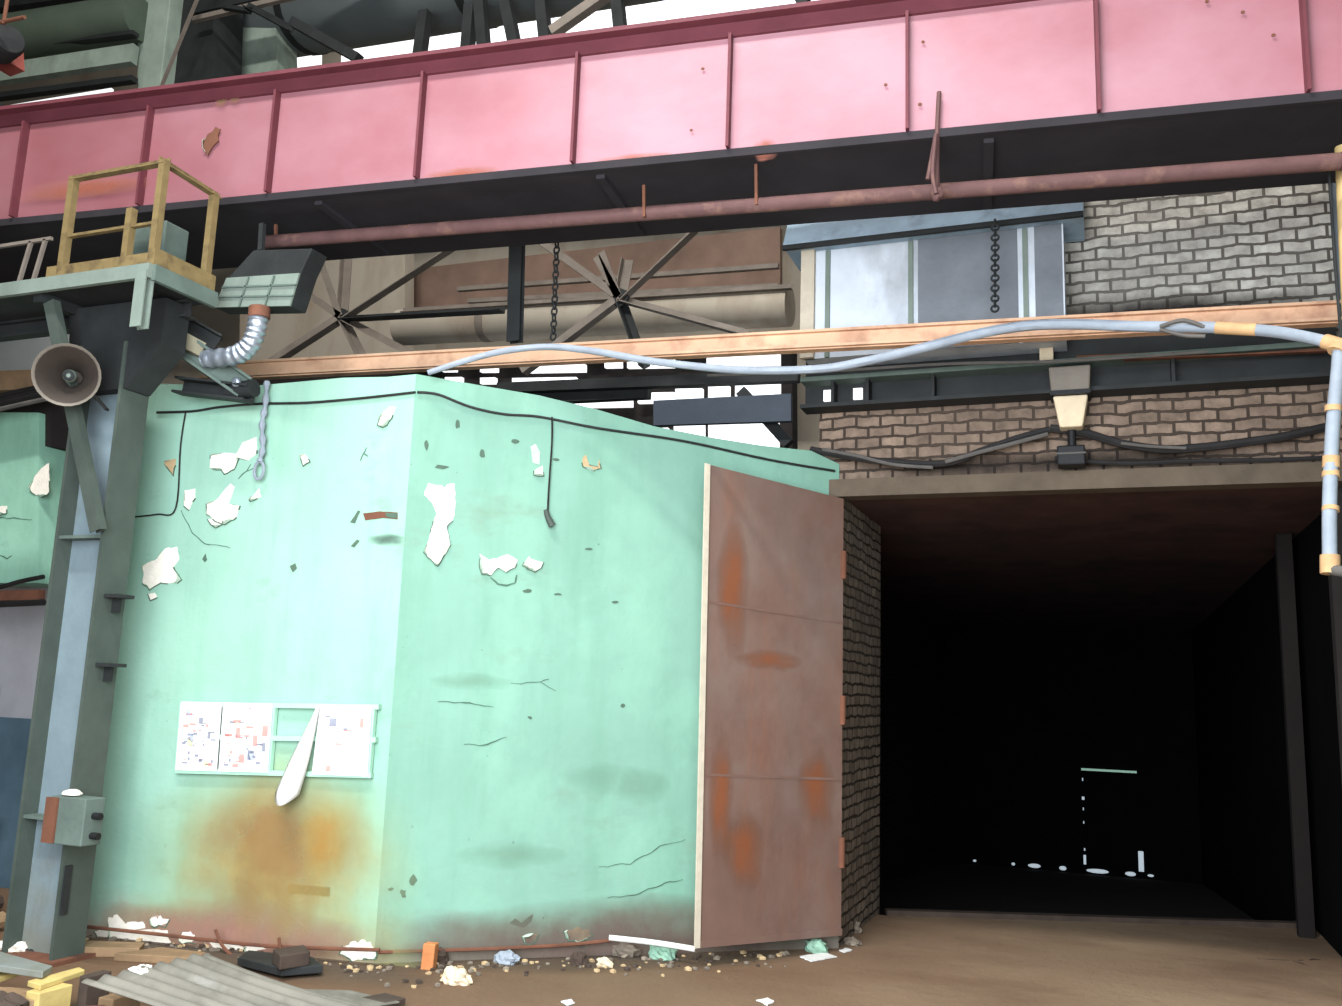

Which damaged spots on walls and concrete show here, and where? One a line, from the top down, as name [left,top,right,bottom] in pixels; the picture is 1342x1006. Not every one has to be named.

peeling [164,459,176,476]
peeling [183,437,261,528]
peeling [423,465,455,567]
peeling [142,547,182,601]
peeling [479,554,544,576]
crack [438,679,556,707]
crack [600,839,685,898]